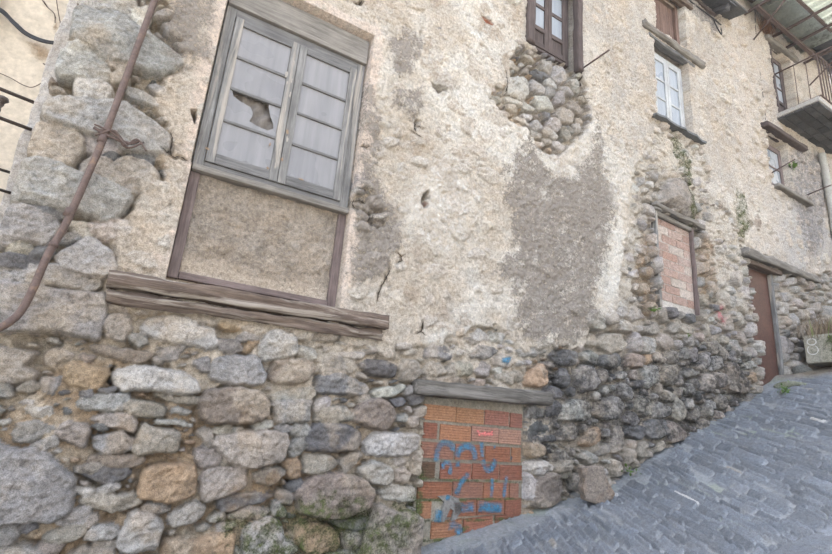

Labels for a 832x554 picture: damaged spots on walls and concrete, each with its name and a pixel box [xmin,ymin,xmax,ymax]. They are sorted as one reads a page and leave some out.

flaking render [490,44,592,156]
flaking render [619,126,711,314]